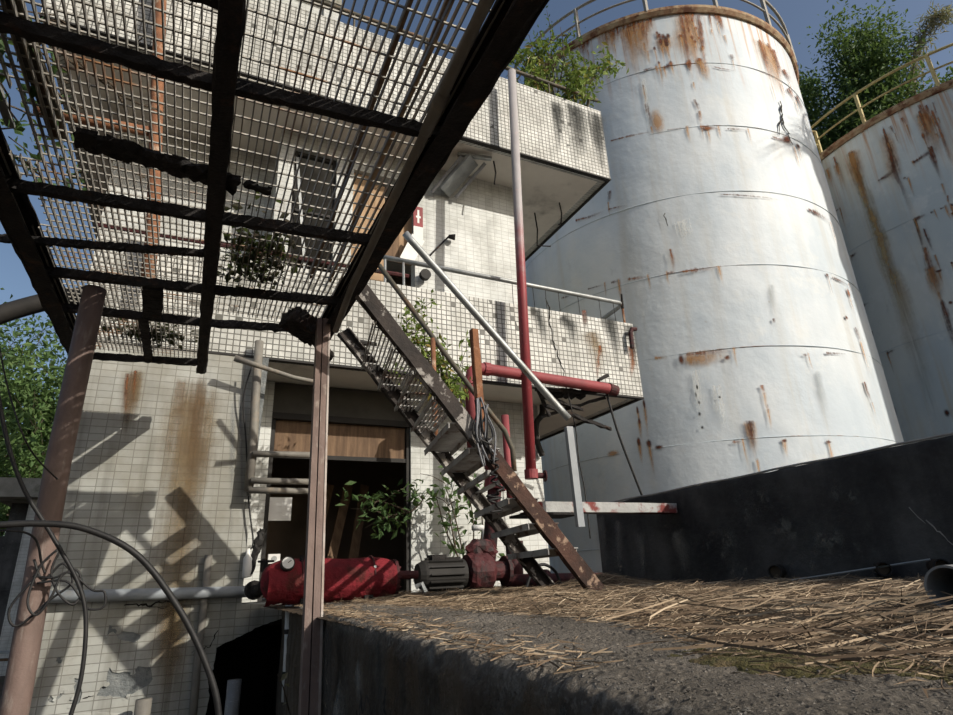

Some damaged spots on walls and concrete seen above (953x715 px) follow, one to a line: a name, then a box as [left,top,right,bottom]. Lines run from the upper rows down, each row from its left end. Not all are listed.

rust [605,13,726,76]
rust [759,40,807,121]
water stain [552,103,603,150]
rust [901,103,946,167]
rust [826,151,902,297]
rust [914,184,953,334]
water stain [603,318,635,346]
rust [679,351,713,363]
rust [733,421,755,451]
rust [169,395,211,582]
spalling [104,625,141,643]
spalling [97,666,153,700]